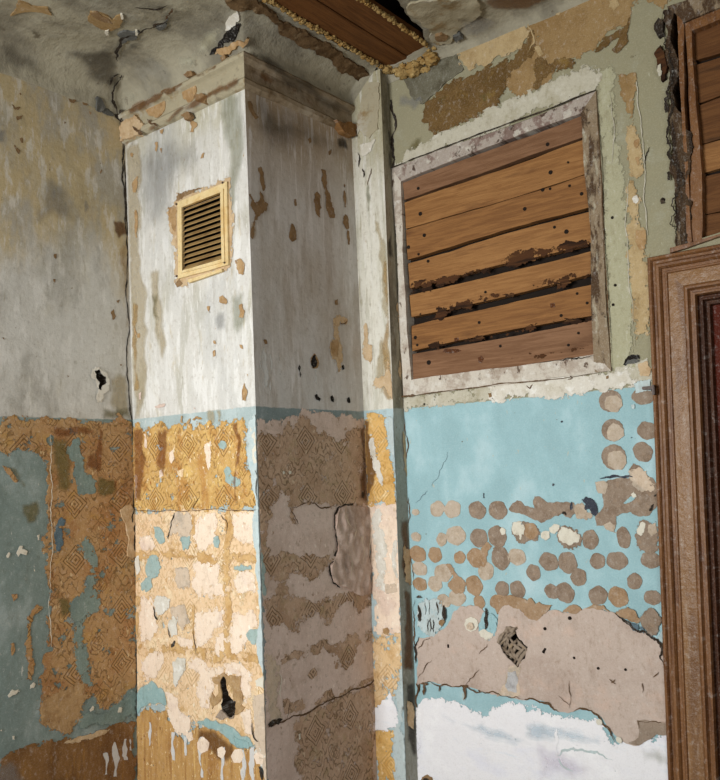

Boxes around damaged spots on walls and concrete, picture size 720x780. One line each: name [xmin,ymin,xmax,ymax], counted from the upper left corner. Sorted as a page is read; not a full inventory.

crack [110,5,173,118]
peeling [181,58,208,132]
peeling [457,0,684,246]
flaking render [91,367,110,403]
peeling [500,521,525,540]
peeling [541,524,580,545]
peeling [574,497,598,520]
flaking render [0,408,415,780]
crack [268,680,374,727]
flaking render [416,595,666,746]